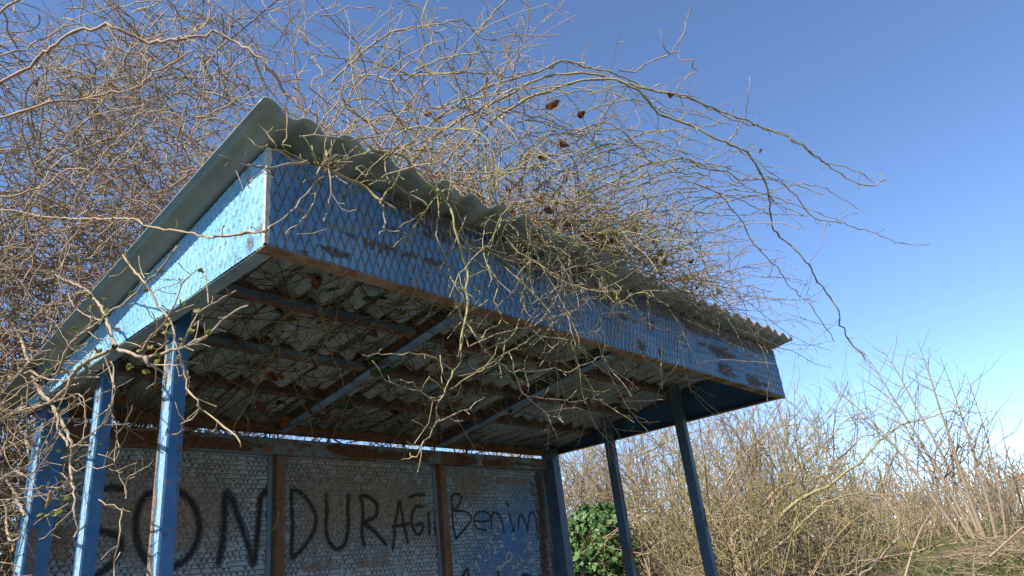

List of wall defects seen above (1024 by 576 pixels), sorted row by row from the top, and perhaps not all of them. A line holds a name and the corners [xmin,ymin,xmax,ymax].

rust [342,192,775,389]
rust [110,427,159,446]
rust [182,433,263,452]